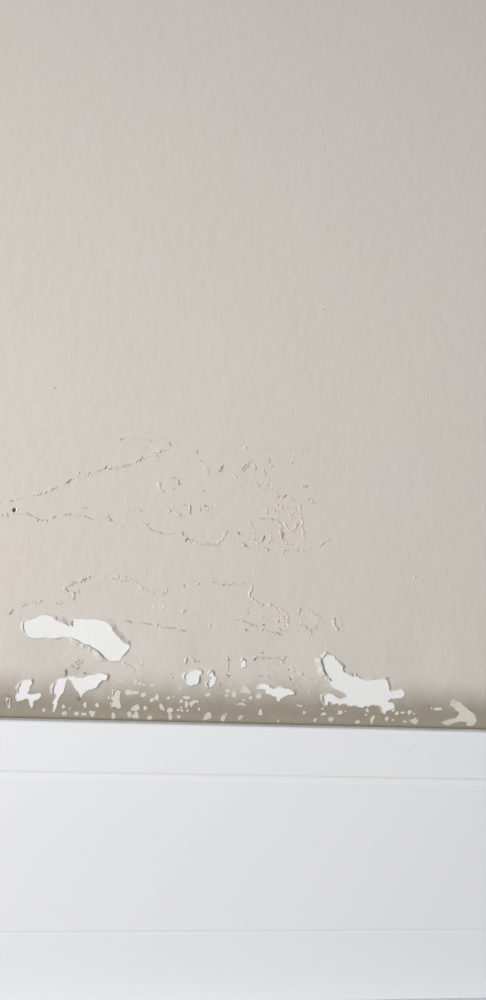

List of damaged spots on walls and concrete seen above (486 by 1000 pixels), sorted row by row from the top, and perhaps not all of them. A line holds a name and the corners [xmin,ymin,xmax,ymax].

crack [0,442,331,553]
crack [8,575,323,692]
peeling [3,613,418,724]
peeling [429,699,477,727]